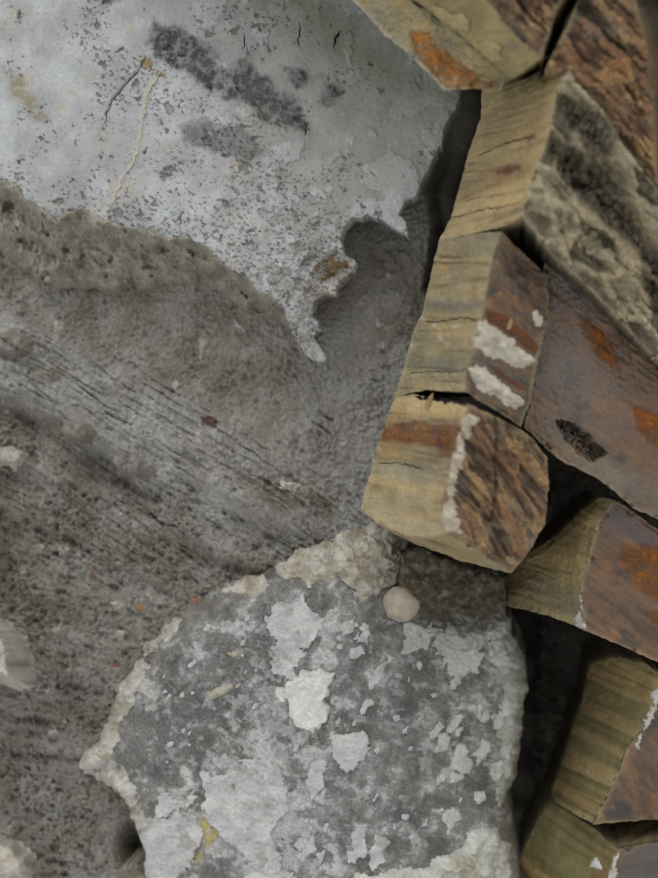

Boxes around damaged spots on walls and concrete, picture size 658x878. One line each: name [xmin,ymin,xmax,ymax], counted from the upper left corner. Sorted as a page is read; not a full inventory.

crack [105,58,166,213]
spalling [0,180,291,329]
peeling [265,593,495,804]
peeling [428,702,510,785]
peeling [139,757,293,878]
peeling [294,818,329,864]
peeling [347,814,409,872]
peeling [439,797,463,836]